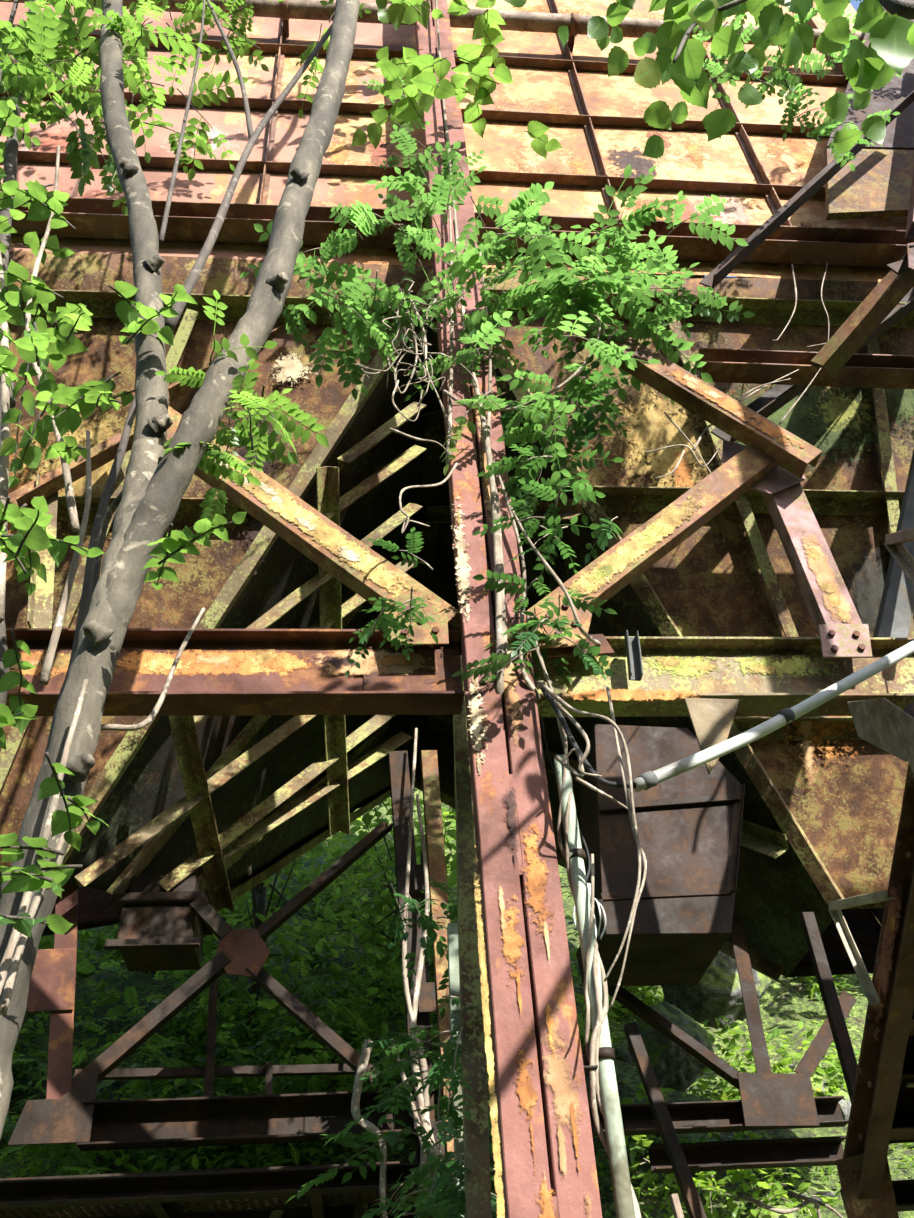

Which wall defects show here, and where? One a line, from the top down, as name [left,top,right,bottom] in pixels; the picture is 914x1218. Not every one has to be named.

rust [493,98,577,126]
rust [512,101,742,224]
rust [765,136,825,174]
rust [235,507,264,549]
rust [802,528,855,624]
rust [9,651,72,678]
rust [116,648,436,677]
rust [560,688,705,702]
rust [778,716,869,795]
rust [498,788,555,1015]
rust [474,845,505,1218]
rust [513,1003,581,1218]